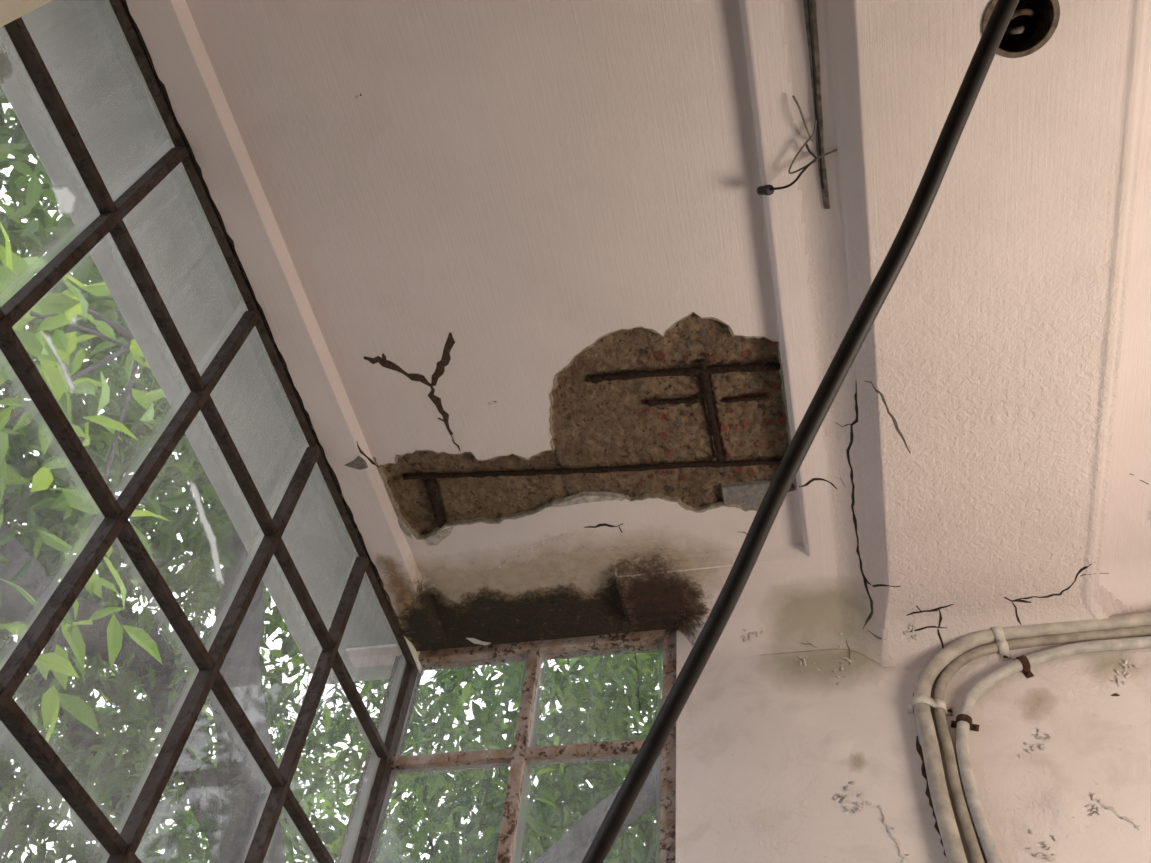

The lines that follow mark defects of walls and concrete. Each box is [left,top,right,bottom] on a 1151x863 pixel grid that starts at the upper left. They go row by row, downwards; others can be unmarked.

crack [364,332,461,451]
spalling [345,312,791,545]
crack [799,381,954,665]
damp [396,544,709,652]
crack [1004,562,1109,625]
crack [916,736,946,856]